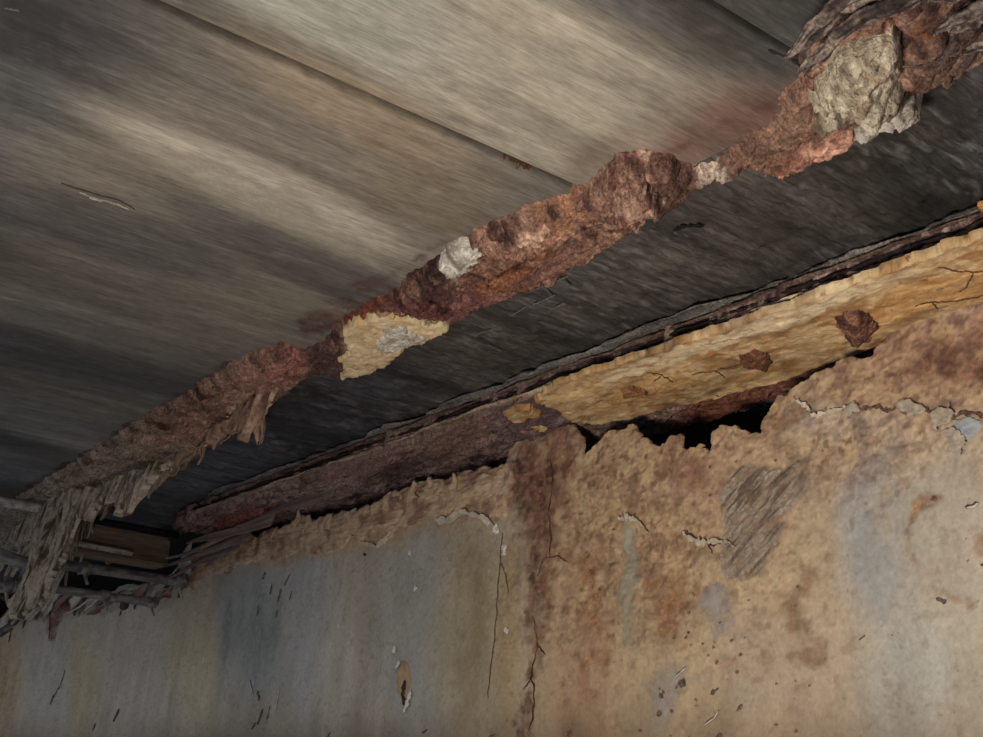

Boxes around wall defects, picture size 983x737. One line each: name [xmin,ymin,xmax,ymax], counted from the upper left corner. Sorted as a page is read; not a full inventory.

spalling [783,0,983,138]
peeling [338,311,451,381]
rust [621,385,648,399]
peeling [503,228,983,434]
peeling [793,396,983,456]
peeling [46,504,110,637]
peeling [177,461,518,598]
peeling [392,646,412,713]
crack [487,533,508,698]
rust [511,451,558,654]
crack [523,617,546,731]
crack [537,459,567,576]